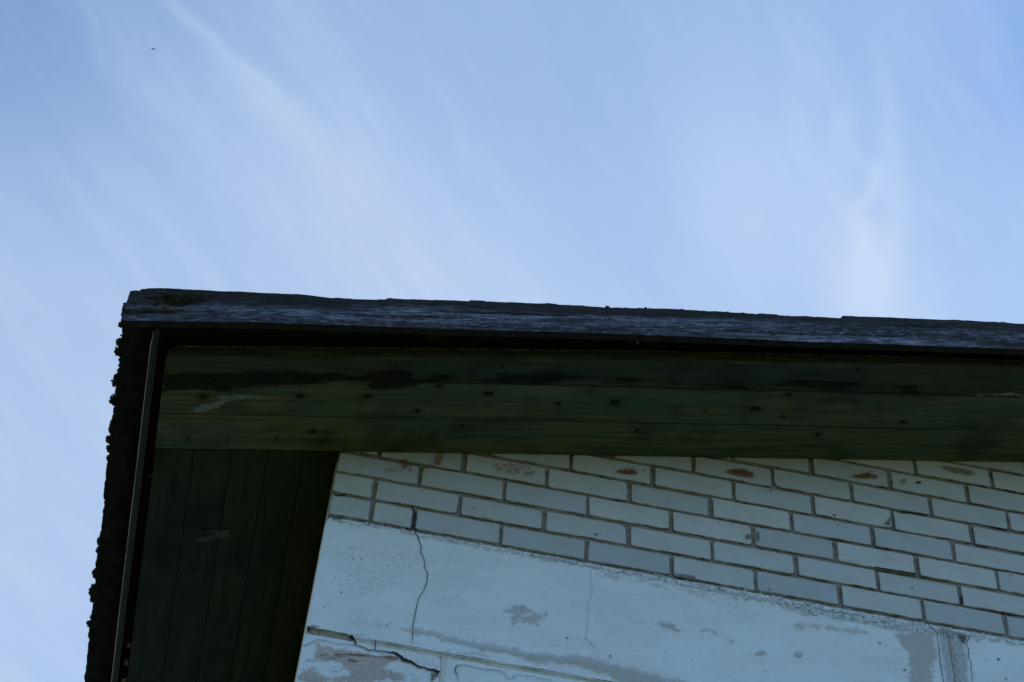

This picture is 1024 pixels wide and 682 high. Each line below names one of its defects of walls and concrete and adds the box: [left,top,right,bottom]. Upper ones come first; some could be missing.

rust [728,468,767,477]
peeling [298,625,423,682]
crack [303,505,547,681]
spalling [339,519,1024,682]